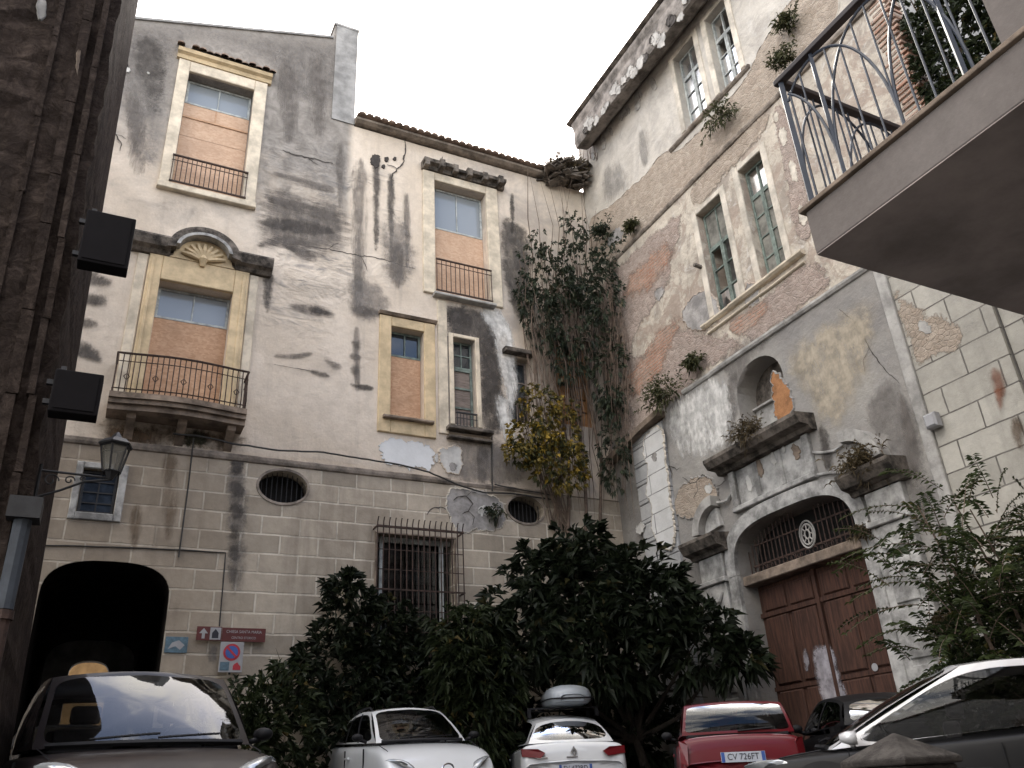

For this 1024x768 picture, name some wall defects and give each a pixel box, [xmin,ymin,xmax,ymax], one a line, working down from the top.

water stain [125,30,185,155]
water stain [258,41,335,140]
water stain [259,147,413,318]
flaking render [583,0,840,551]
water stain [351,328,373,390]
water stain [447,307,523,484]
crack [839,309,899,383]
corrosion [992,371,1004,406]
water stain [229,461,246,583]
flaking render [435,444,506,534]